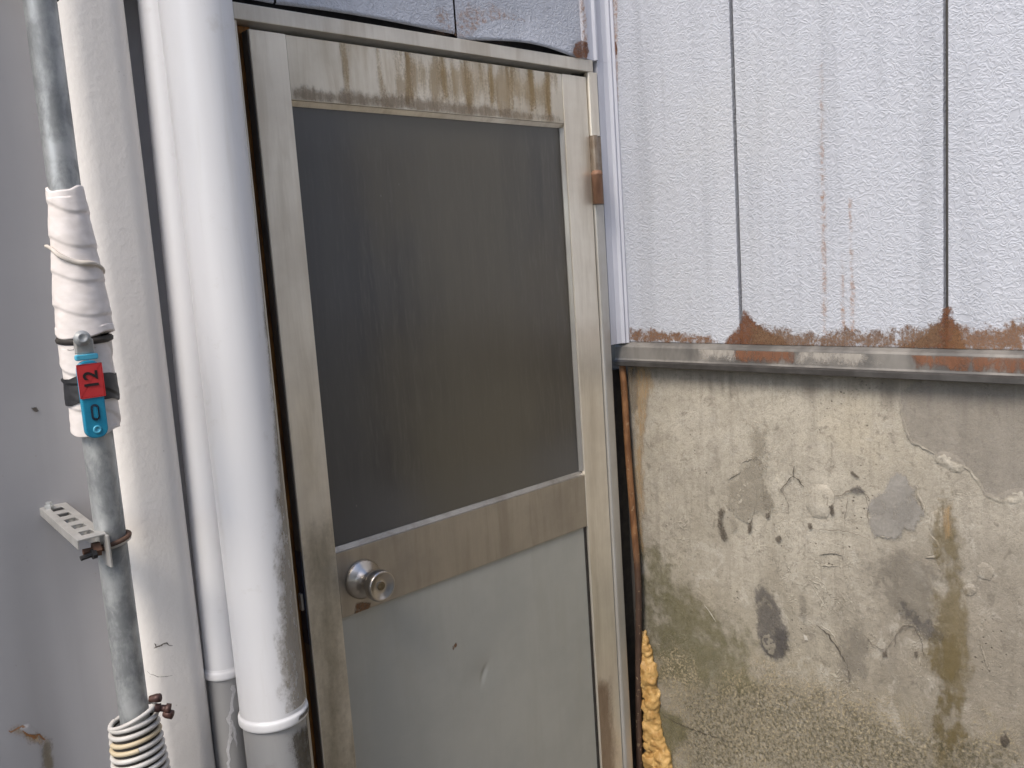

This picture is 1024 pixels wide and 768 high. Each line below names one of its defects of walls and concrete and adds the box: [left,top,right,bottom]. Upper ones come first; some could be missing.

rust [295,88,532,118]
rust [630,306,1024,373]
peeling [717,426,771,542]
water stain [755,587,788,659]
rust [9,724,52,768]